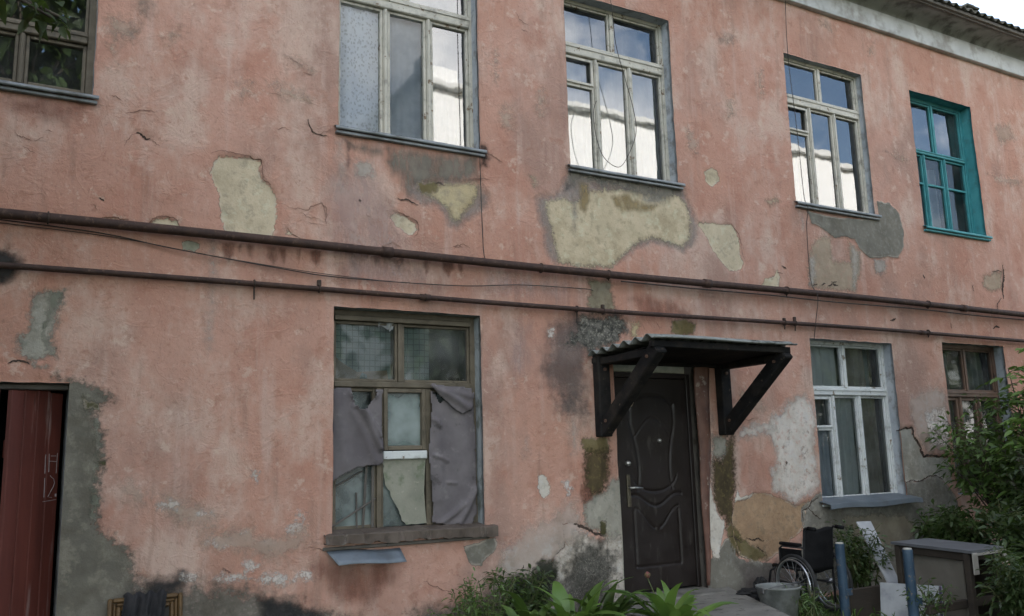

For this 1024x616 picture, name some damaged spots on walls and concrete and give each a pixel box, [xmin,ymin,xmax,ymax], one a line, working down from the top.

crack [113,95,158,145]
peeling [210,150,303,239]
spalling [390,178,488,235]
spalling [546,168,745,271]
peeling [809,236,861,291]
peeling [9,289,65,368]
water stain [546,279,644,412]
peeling [537,475,572,498]
water stain [581,437,610,503]
water stain [712,436,792,588]
spalling [710,391,960,595]